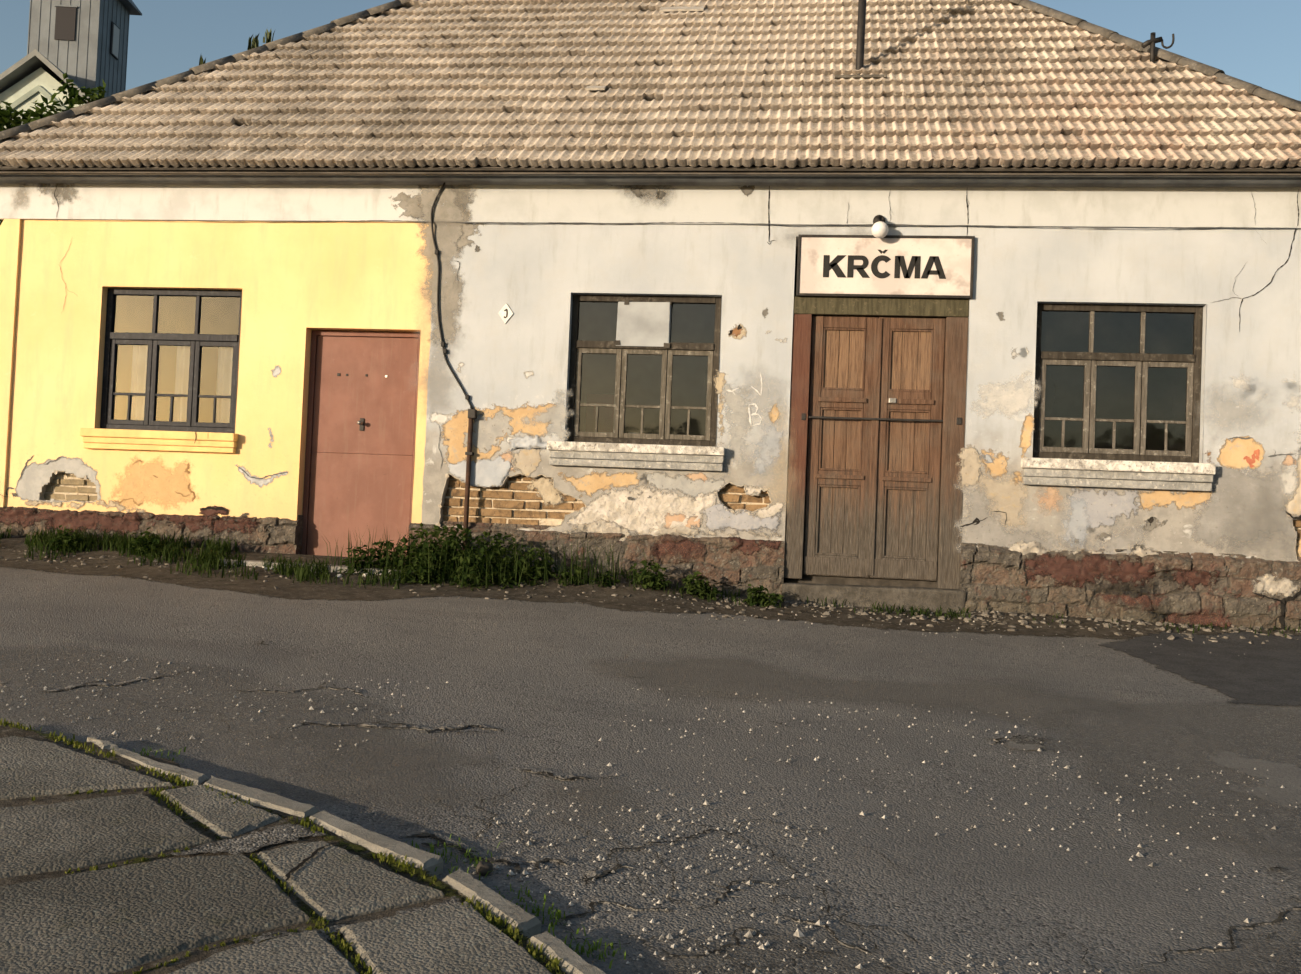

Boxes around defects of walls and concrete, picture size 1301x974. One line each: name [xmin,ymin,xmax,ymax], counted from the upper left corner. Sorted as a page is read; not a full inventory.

crack [160,217,425,225]
crack [458,186,1299,332]
peeling [0,455,258,538]
peeling [235,464,288,487]
spalling [429,370,787,559]
crack [1252,588,1301,630]